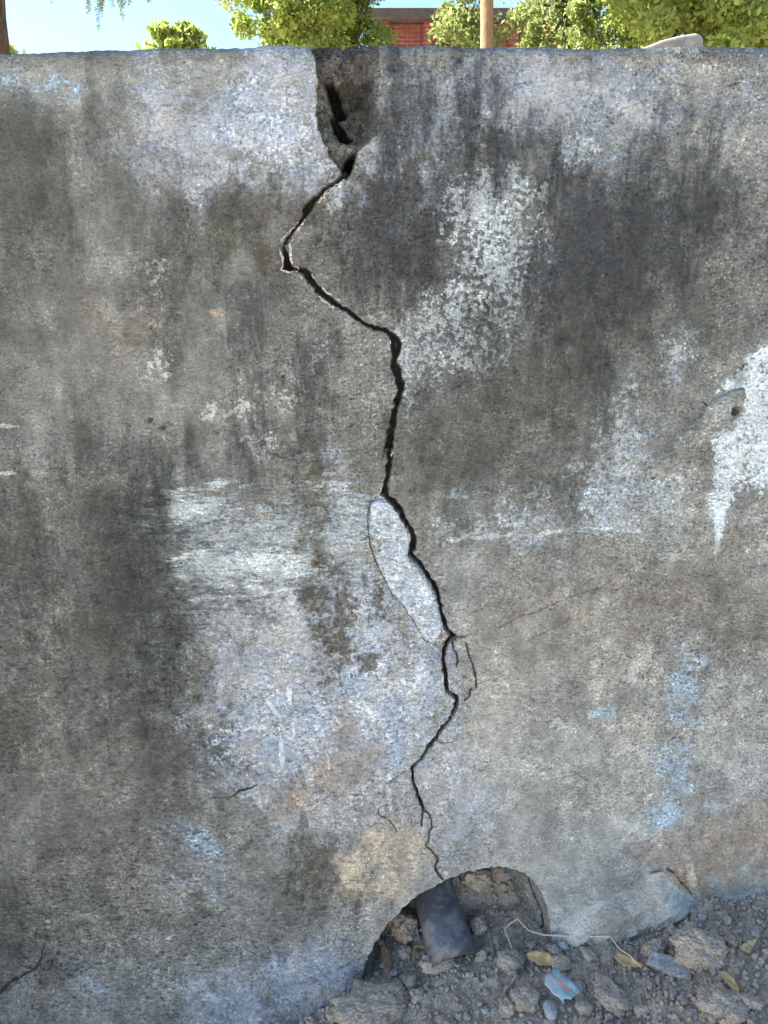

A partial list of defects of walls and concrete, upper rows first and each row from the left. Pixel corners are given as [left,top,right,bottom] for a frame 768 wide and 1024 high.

peeling [100,45,768,215]
damp [333,45,737,407]
damp [145,257,176,382]
damp [240,431,279,462]
damp [201,337,335,423]
crack [279,171,477,880]